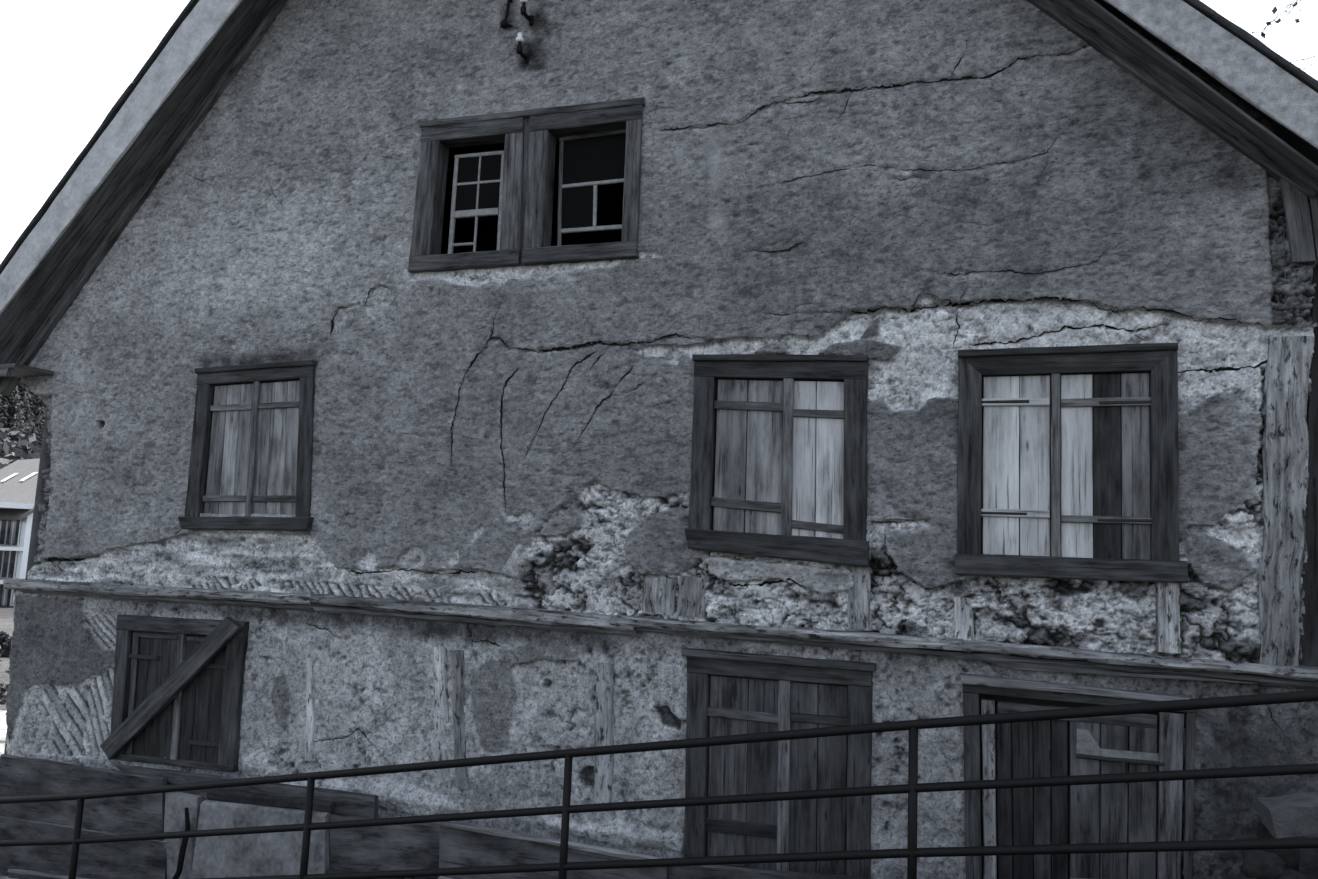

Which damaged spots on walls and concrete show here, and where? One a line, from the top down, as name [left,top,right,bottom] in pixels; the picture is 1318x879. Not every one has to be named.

crack [662,33,1085,131]
crack [782,133,1059,195]
crack [317,285,387,364]
crack [408,312,704,513]
flaking render [17,175,1317,664]